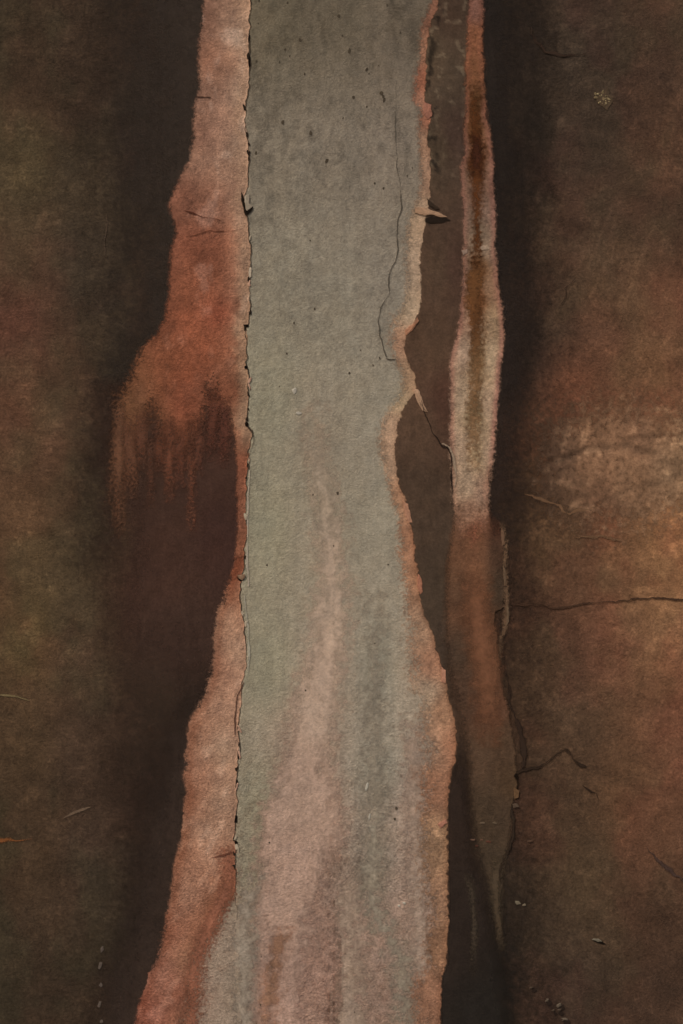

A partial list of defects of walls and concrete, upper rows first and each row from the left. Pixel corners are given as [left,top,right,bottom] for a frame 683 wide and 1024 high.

crack [378,109,402,360]
corrosion [449,0,505,542]
corrosion [109,0,252,1024]
peeling [184,0,450,1024]
crack [420,400,457,489]
crack [511,597,683,609]
crack [499,639,599,882]